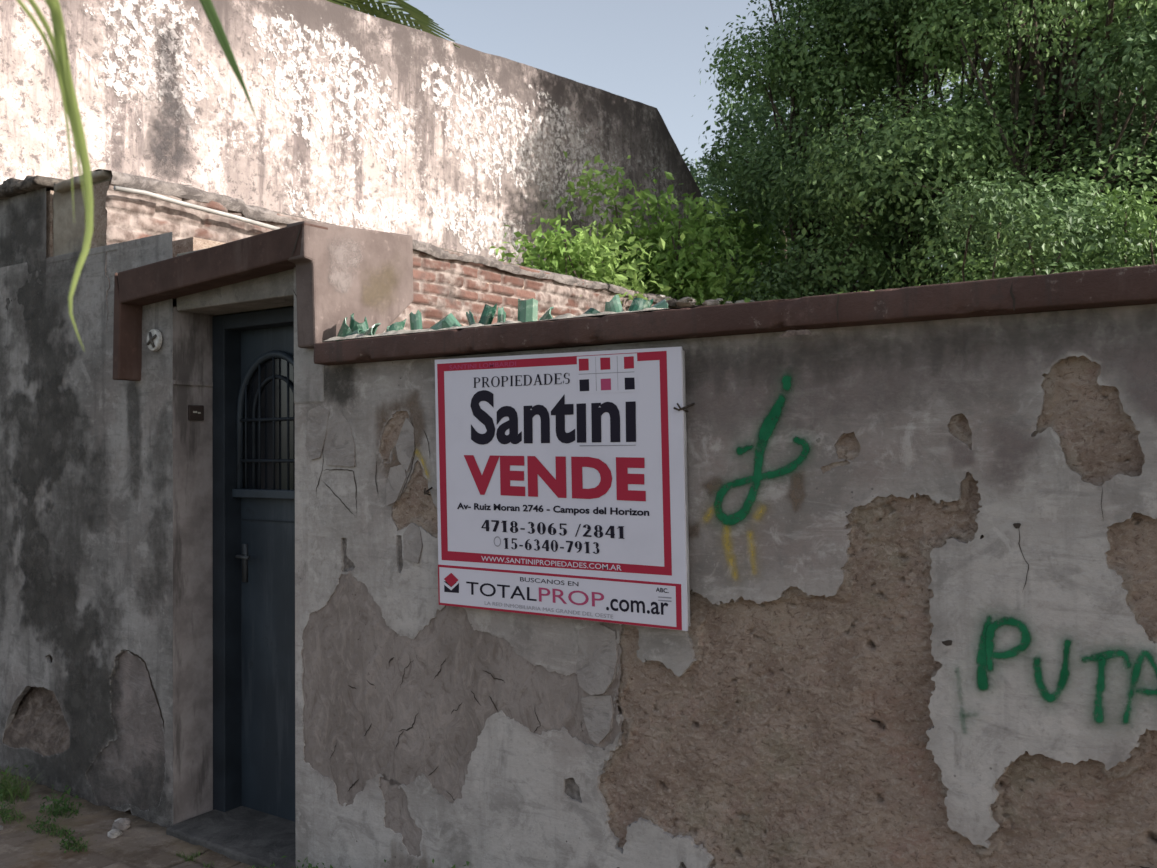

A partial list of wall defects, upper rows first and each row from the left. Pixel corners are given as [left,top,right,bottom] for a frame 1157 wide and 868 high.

leakage [151,31,192,179]
leakage [0,197,165,811]
spalling [386,418,438,564]
spalling [1032,356,1145,486]
spalling [3,687,70,757]
spalling [302,472,1157,868]